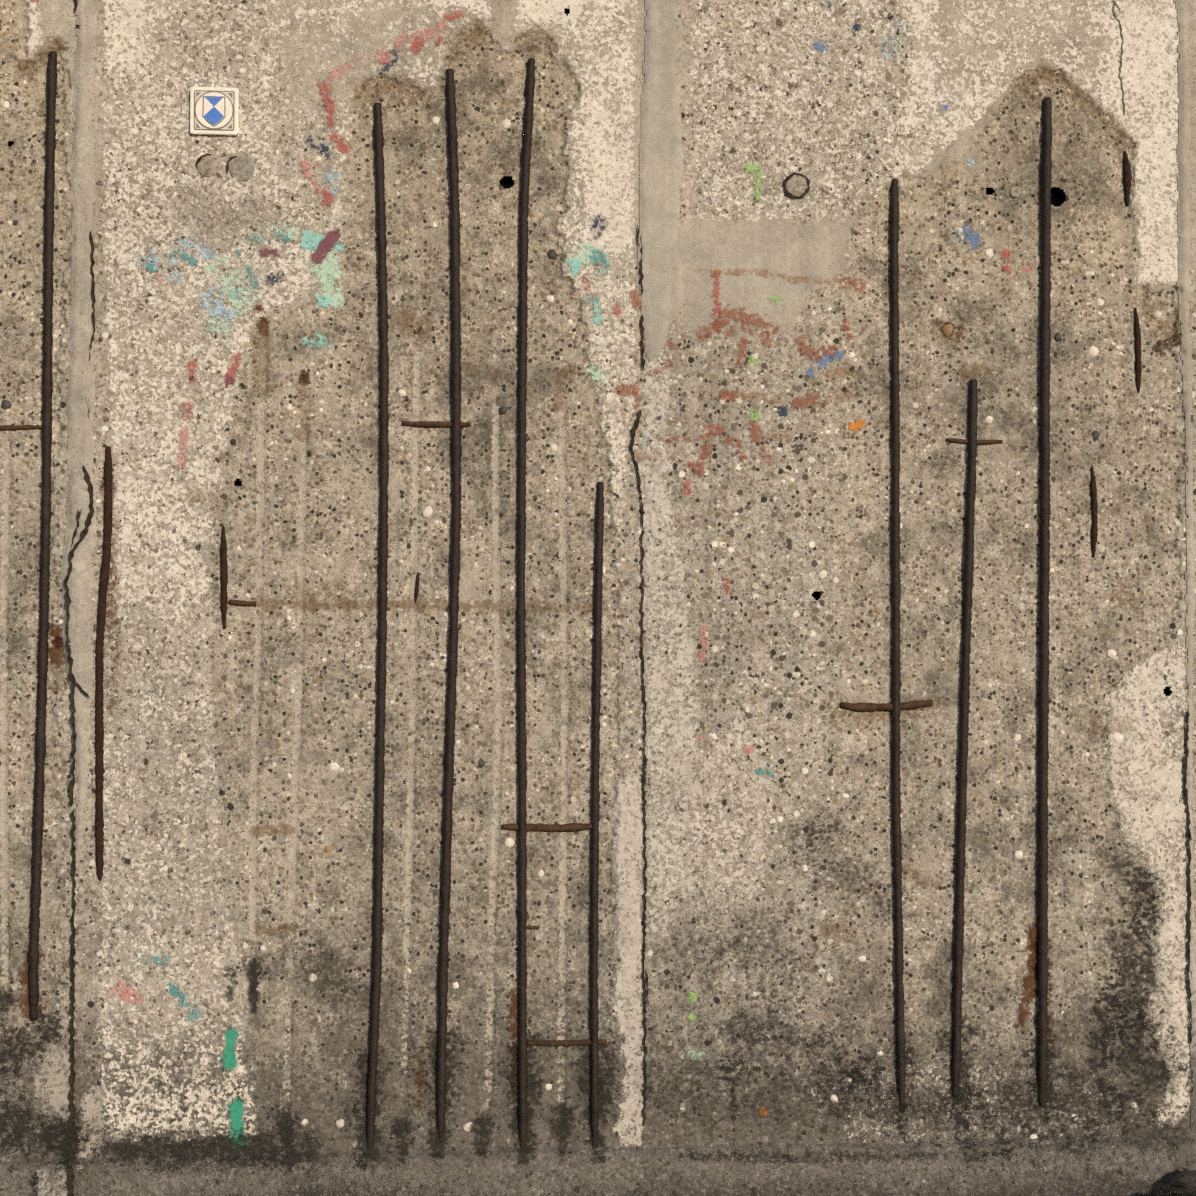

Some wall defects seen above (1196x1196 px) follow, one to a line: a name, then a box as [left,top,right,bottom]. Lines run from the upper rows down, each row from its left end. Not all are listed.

crack [82,230,96,418]
corrosion [256,304,269,335]
corrosion [299,370,310,384]
corrosion [48,625,66,665]
spalling [0,0,779,1196]
spalling [689,0,1191,1148]
crack [64,466,94,1196]
crack [630,410,649,1126]
corrosion [17,946,45,1024]
leakage [0,848,1185,1196]
corrosion [1018,917,1055,1087]